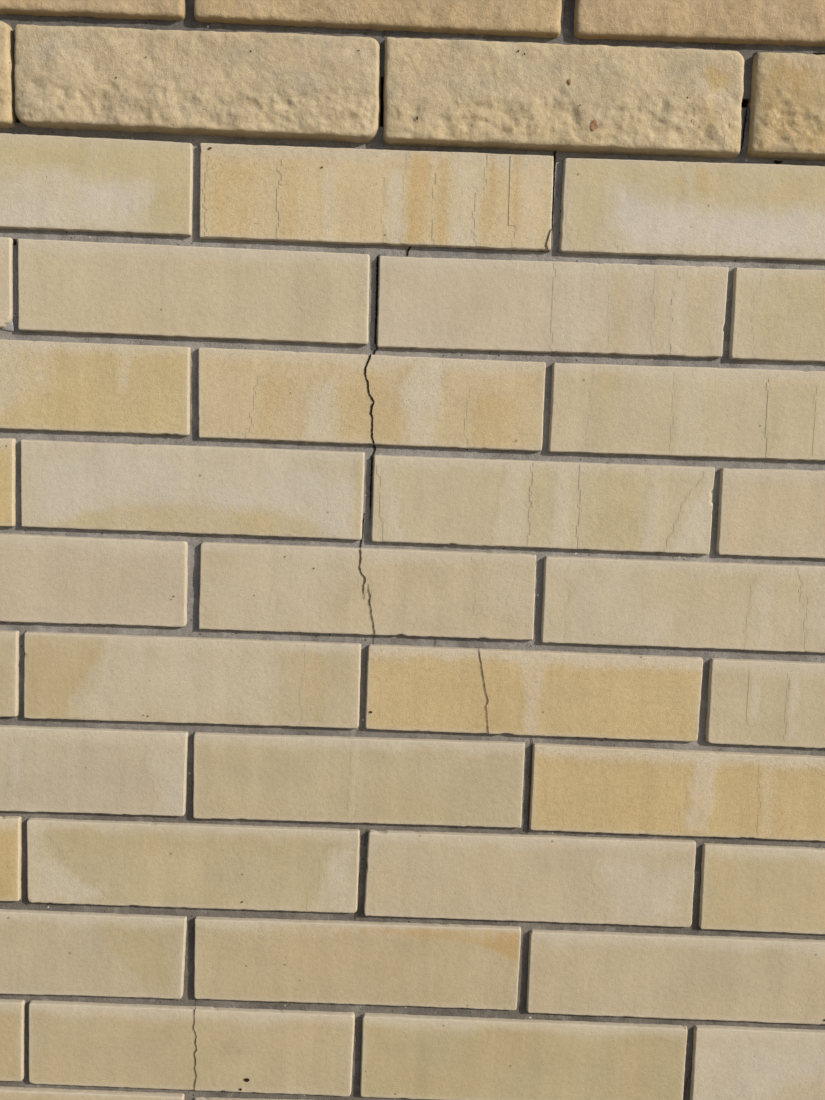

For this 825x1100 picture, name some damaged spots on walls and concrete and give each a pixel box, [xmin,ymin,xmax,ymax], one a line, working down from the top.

crack [359,255,380,644]
crack [478,648,489,735]
crack [191,999,199,1091]